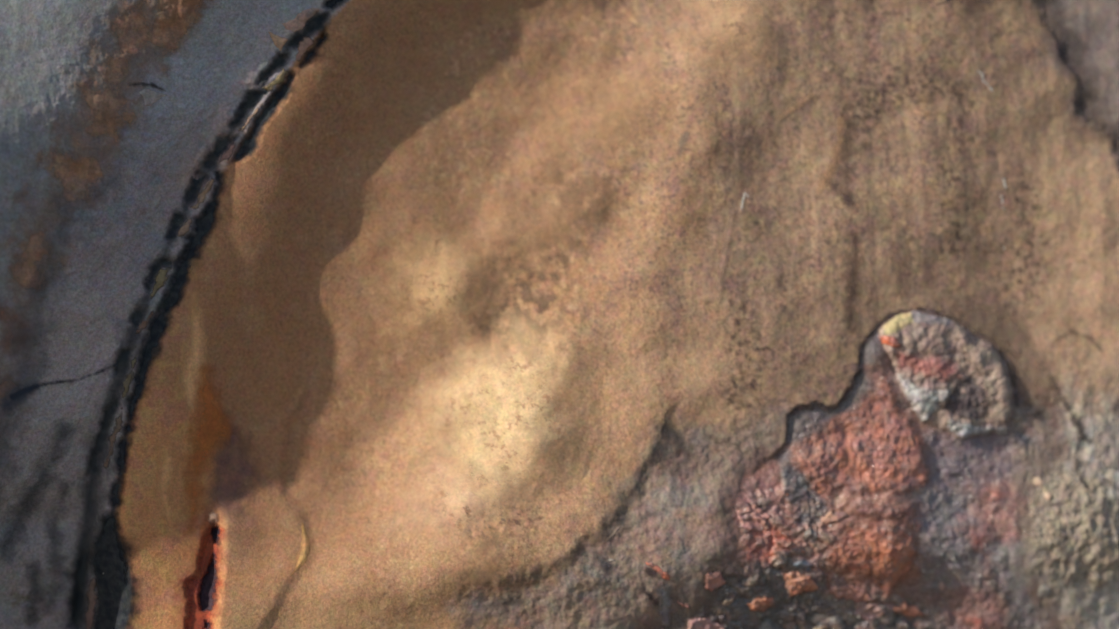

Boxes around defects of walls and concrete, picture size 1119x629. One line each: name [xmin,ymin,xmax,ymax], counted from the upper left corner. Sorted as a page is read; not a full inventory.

flaking render [268,7,319,52]
spalling [647,308,1061,629]
crack [1050,377,1109,488]
corrosion [184,513,221,629]